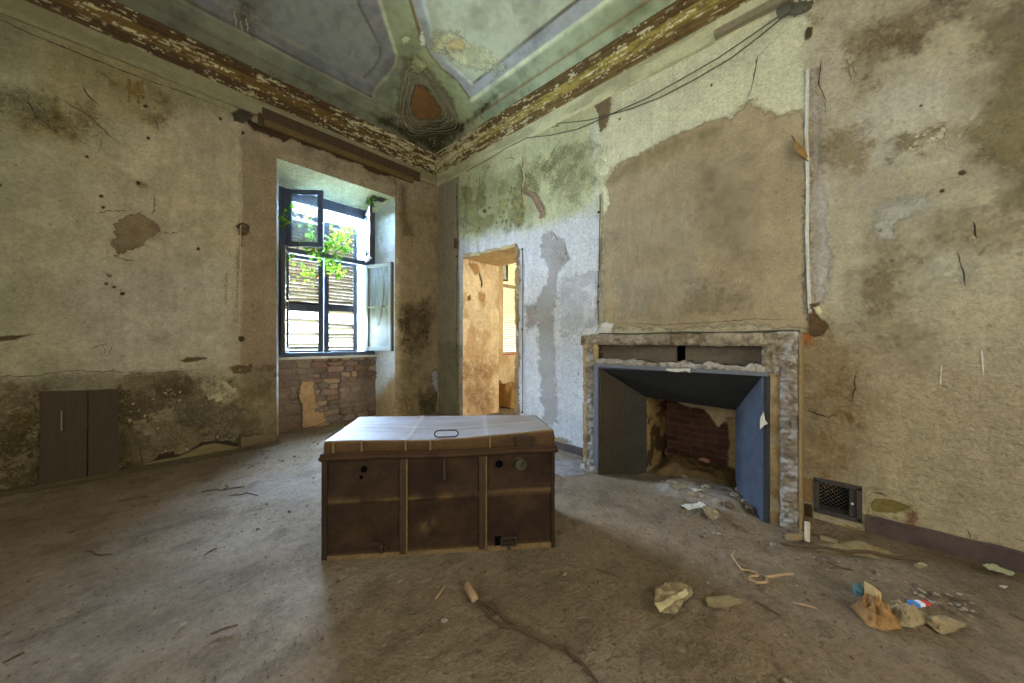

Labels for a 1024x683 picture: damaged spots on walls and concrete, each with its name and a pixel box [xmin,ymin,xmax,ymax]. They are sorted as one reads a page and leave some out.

peeling [402,30,503,74]
flaking render [232,108,391,176]
damp [377,57,496,153]
damp [824,132,875,175]
damp [844,0,1024,249]
flaking render [96,197,175,261]
flaking render [595,97,829,337]
crack [957,221,977,286]
peeling [536,232,568,425]
damp [0,381,51,490]
damp [119,368,279,469]